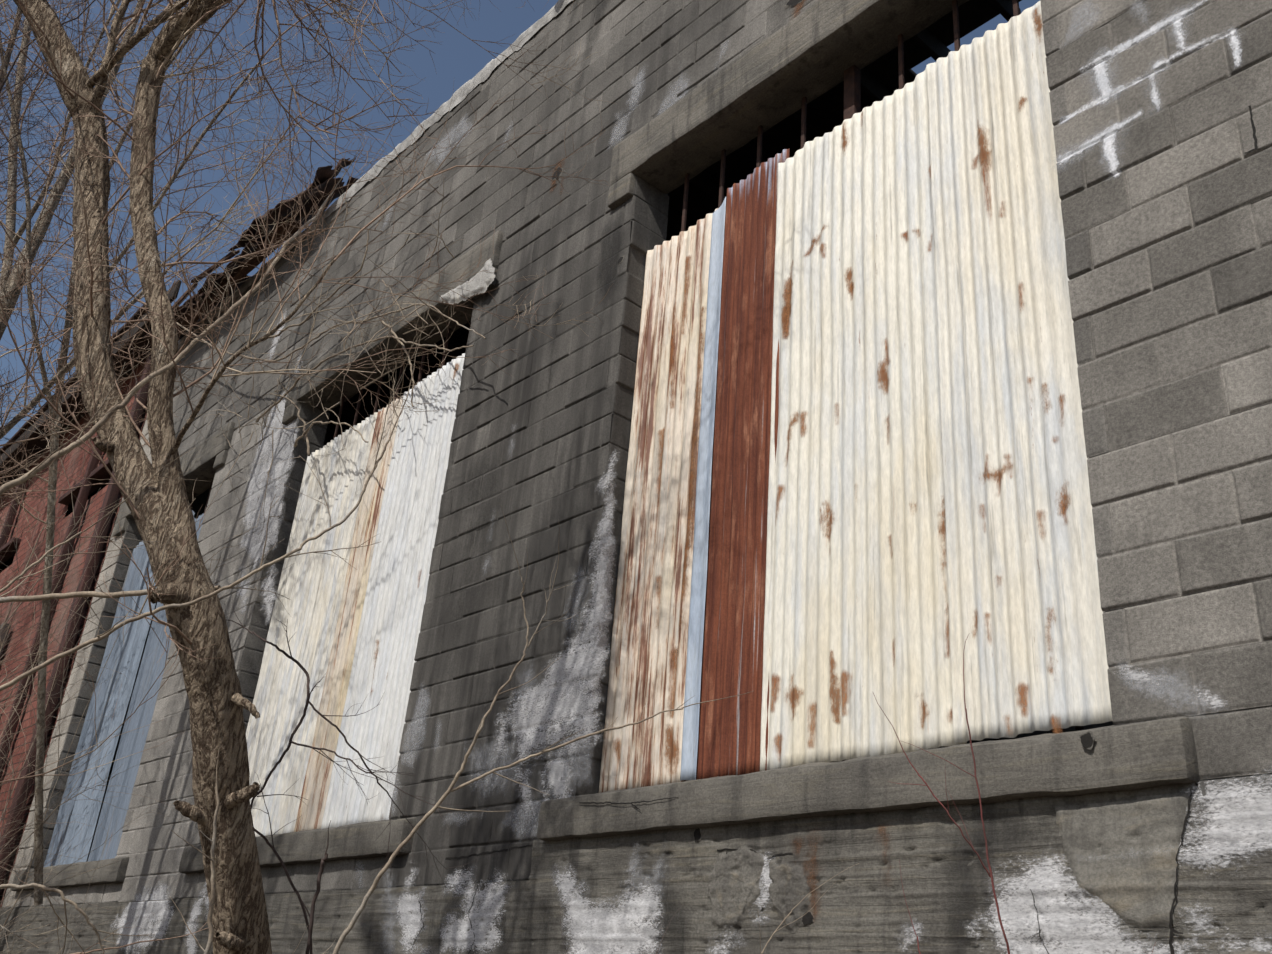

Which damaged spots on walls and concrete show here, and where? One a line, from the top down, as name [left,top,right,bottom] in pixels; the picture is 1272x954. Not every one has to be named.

corrosion [974,128,1002,216]
corrosion [781,274,792,338]
corrosion [681,307,704,599]
efflorescence [494,452,618,822]
corrosion [665,649,678,773]
corrosion [771,675,816,747]
corrosion [829,651,849,723]
efflorescence [1177,776,1272,867]
efflorescence [396,869,509,954]
efflorescence [553,868,663,954]
leakage [968,855,1272,954]
crack [1169,789,1192,954]